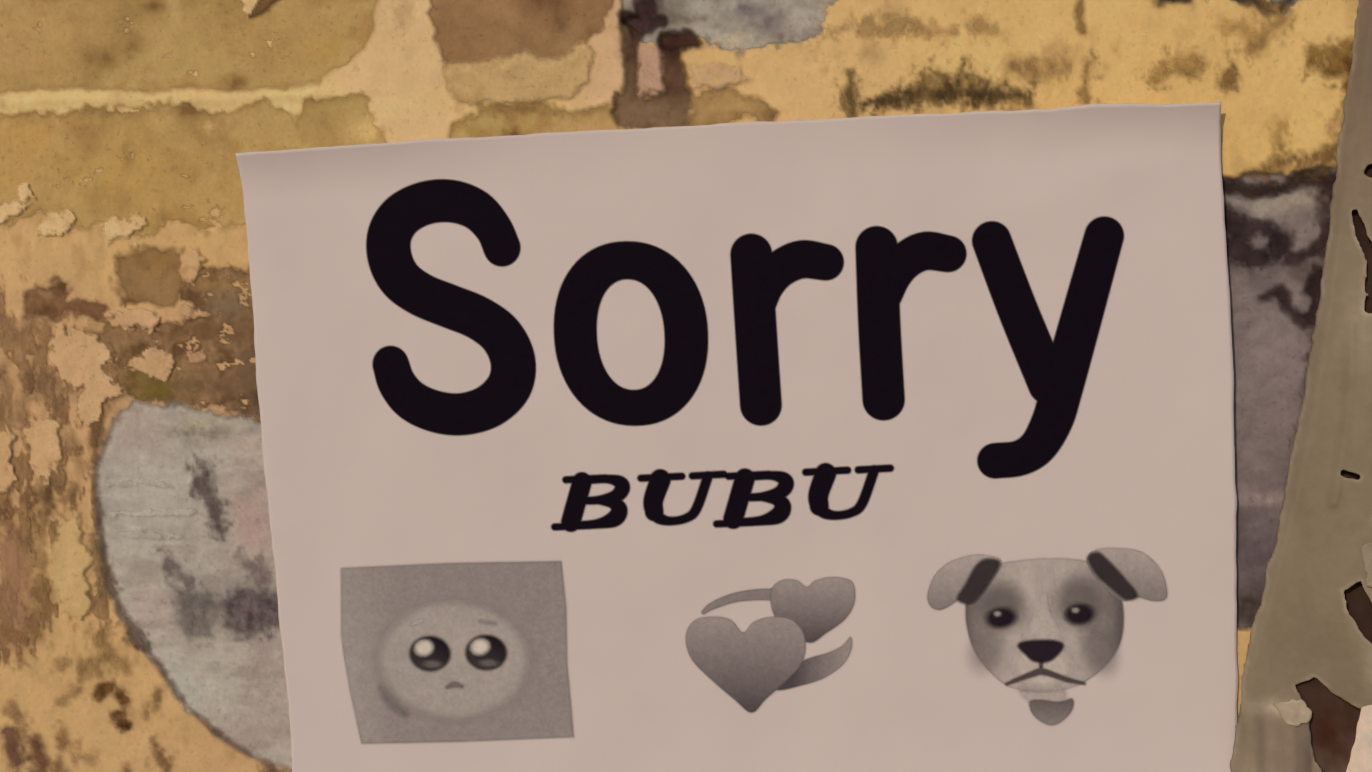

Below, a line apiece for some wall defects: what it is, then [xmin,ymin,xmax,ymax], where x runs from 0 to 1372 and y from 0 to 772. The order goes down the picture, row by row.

spalling [0,0,386,772]
spalling [1222,166,1337,629]